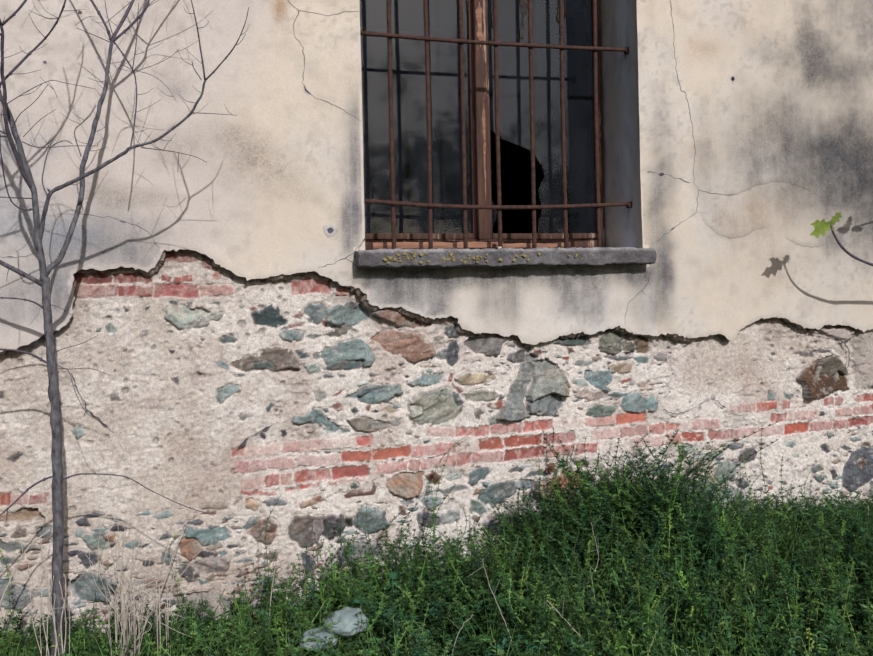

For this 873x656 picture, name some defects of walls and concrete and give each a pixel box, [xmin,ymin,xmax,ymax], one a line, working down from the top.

crack [287,0,359,120]
crack [648,0,736,245]
spalling [0,249,873,649]